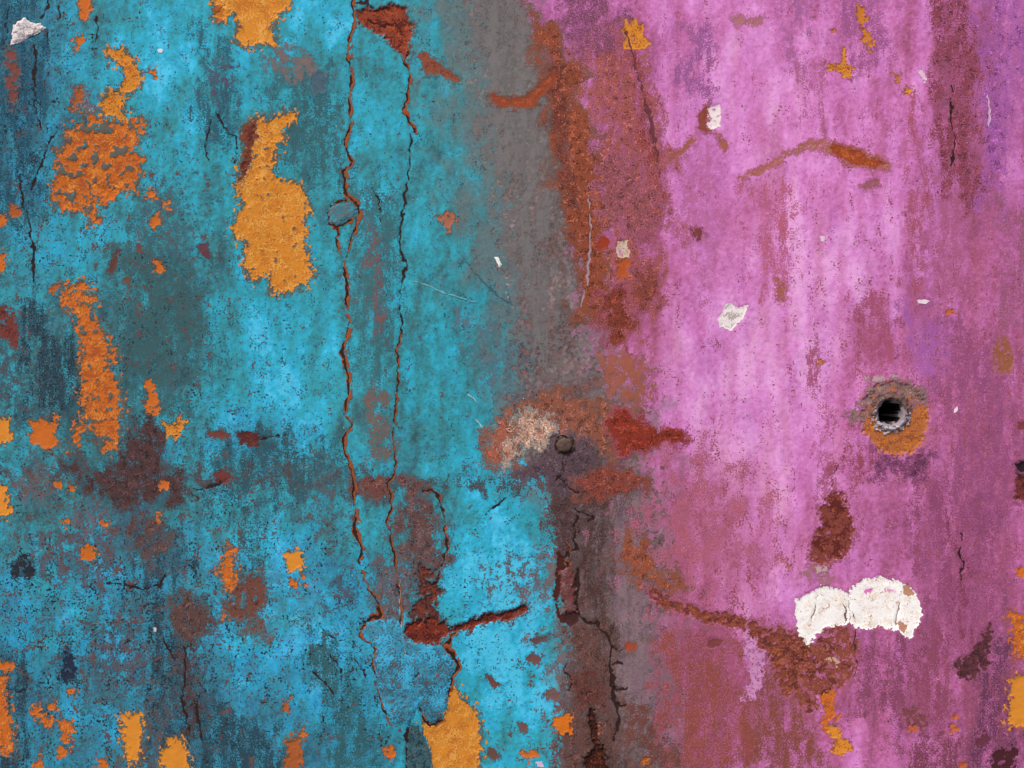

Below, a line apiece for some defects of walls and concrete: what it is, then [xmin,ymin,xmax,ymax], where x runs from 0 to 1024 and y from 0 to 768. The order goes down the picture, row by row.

spalling [10,17,46,45]
peeling [46,39,207,278]
peeling [191,0,319,301]
rust [738,136,892,192]
peeling [0,275,130,458]
rust [0,20,515,768]
crack [56,0,462,768]
rust [372,0,860,768]
rust [841,374,930,428]
spalling [403,543,613,768]
crack [555,455,628,741]
spalling [740,565,923,757]